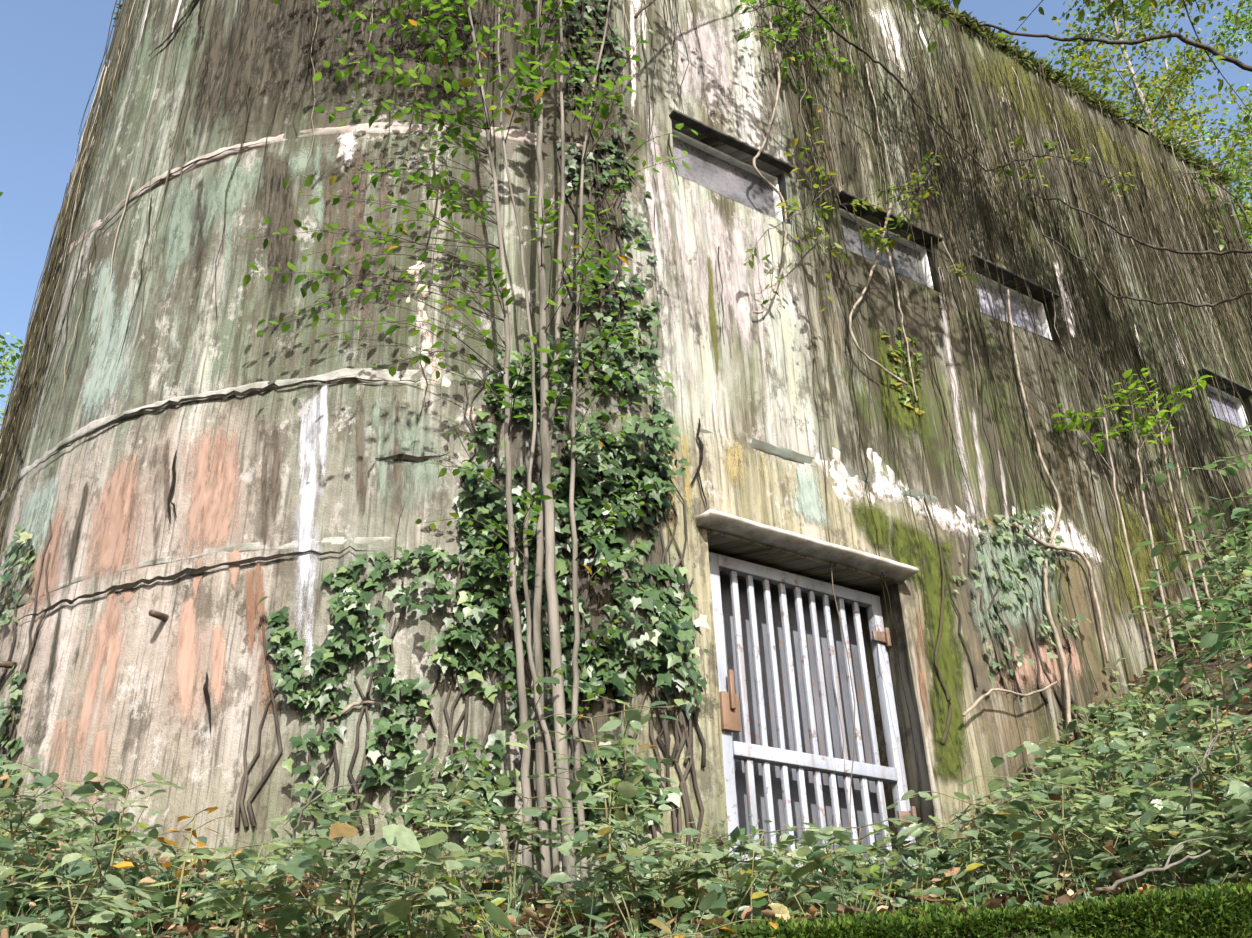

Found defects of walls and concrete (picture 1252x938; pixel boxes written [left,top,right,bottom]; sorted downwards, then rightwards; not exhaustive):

water stain [871,9,905,71]
water stain [1055,263,1076,335]
water stain [299,385,328,615]
water stain [938,268,994,612]
water stain [998,450,1013,536]
corrosion [27,508,65,641]
corrosion [51,453,141,802]
crack [18,546,367,620]
corrosion [178,429,269,718]
water stain [924,590,937,723]